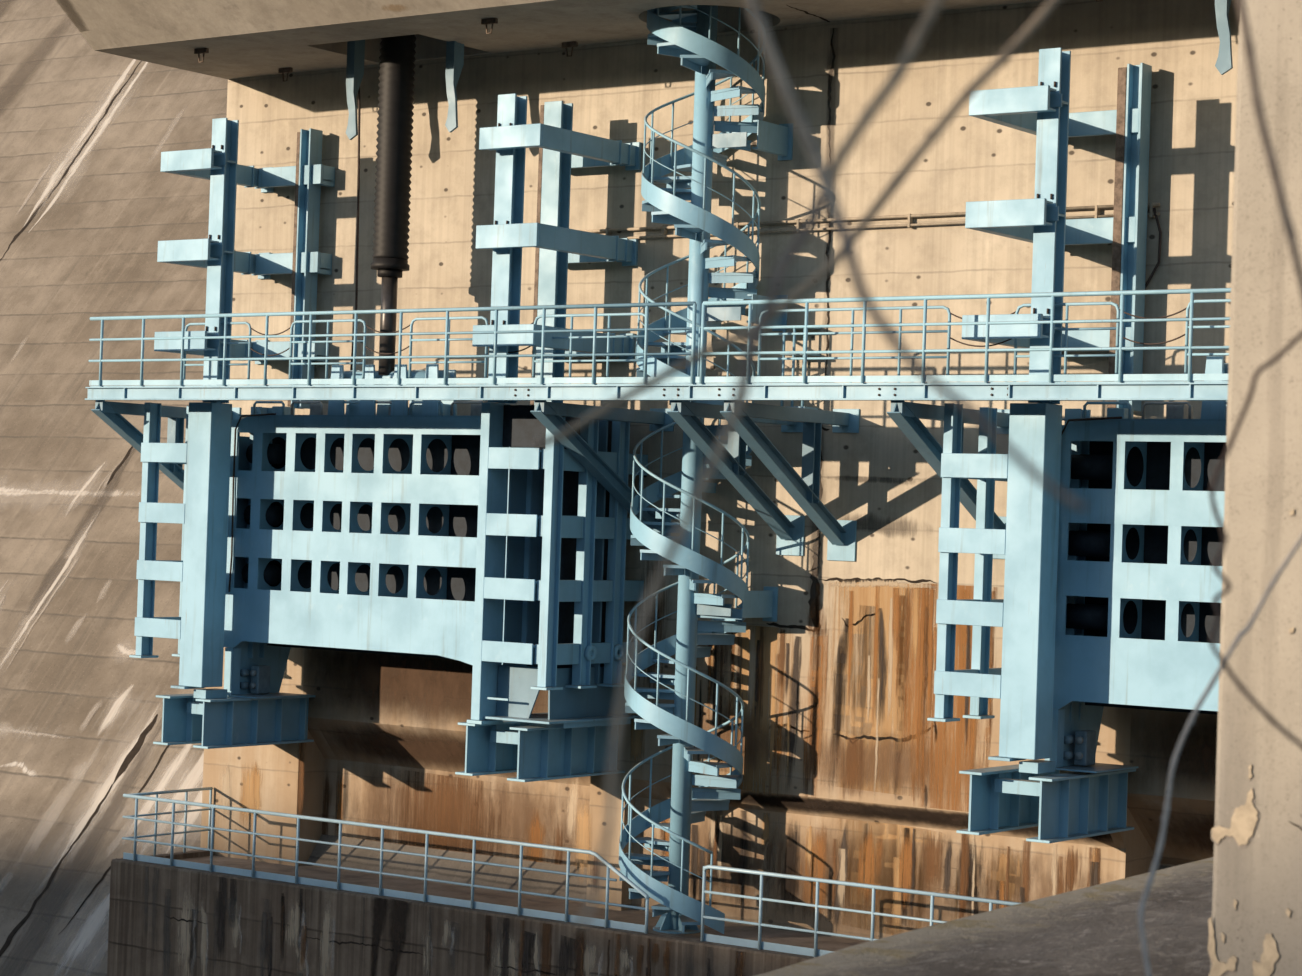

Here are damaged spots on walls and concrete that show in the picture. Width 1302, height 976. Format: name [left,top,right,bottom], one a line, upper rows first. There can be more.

damp [59,0,84,30]
crack [0,59,148,260]
damp [0,446,133,665]
damp [100,688,131,732]
rust [694,582,992,812]
crack [0,714,158,976]
damp [145,866,238,976]
damp [363,897,409,976]
damp [485,915,629,976]
rust [805,820,942,935]
peeling [1211,764,1260,849]
peeling [1207,916,1281,976]